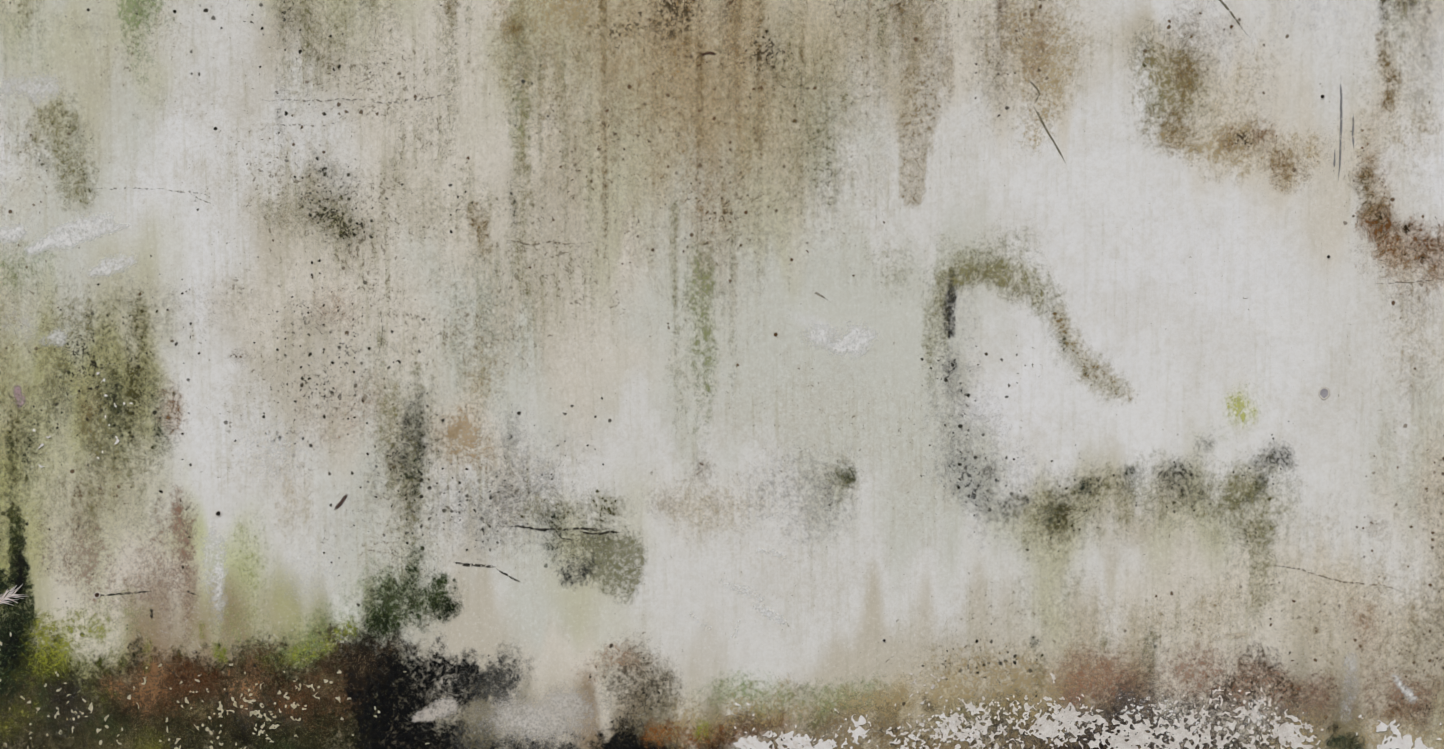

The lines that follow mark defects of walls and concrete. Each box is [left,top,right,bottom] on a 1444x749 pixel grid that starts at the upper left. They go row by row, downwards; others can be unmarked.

leakage [243,0,347,74]
leakage [1142,20,1220,150]
leakage [1377,39,1399,109]
leakage [30,103,92,206]
leakage [294,135,388,255]
leakage [495,0,943,367]
leakage [257,259,644,609]
leakage [921,253,1203,552]
leakage [0,405,41,696]
leakage [289,621,724,749]
leakage [939,623,1045,683]
leakage [971,645,1322,749]